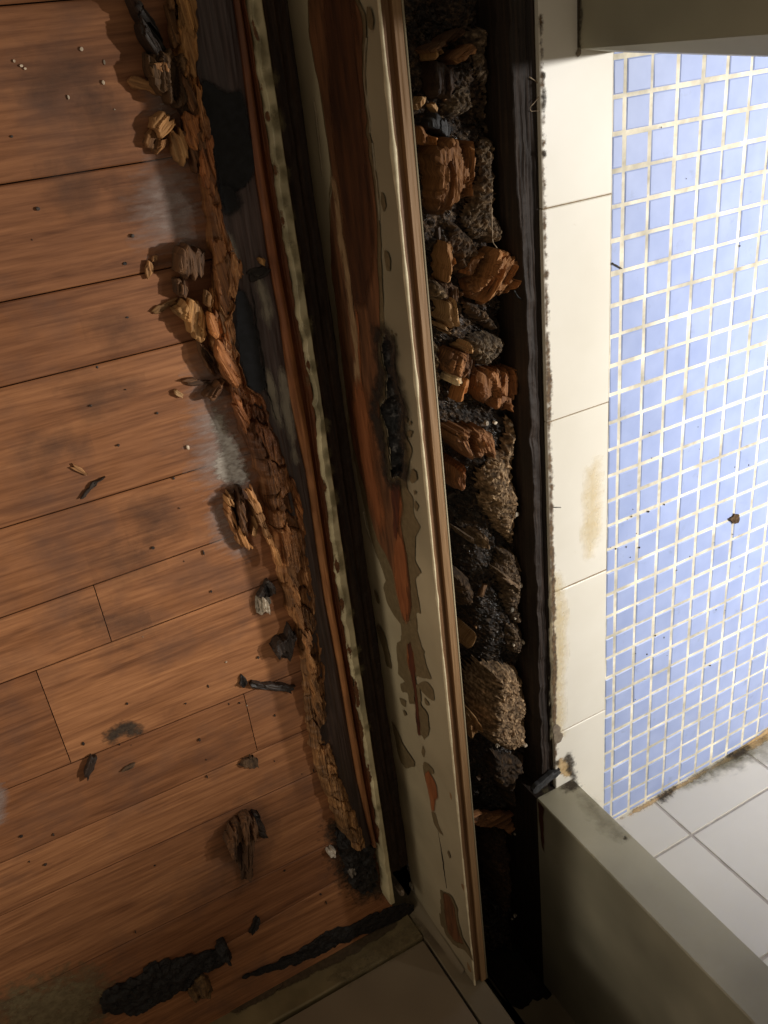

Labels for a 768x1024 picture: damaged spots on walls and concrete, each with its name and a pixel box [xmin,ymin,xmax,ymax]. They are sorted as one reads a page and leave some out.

peeling [308,0,443,835]
peeling [256,578,276,598]
peeling [269,621,297,661]
leakage [325,818,382,904]
spalling [391,873,408,907]
peeling [439,890,474,962]